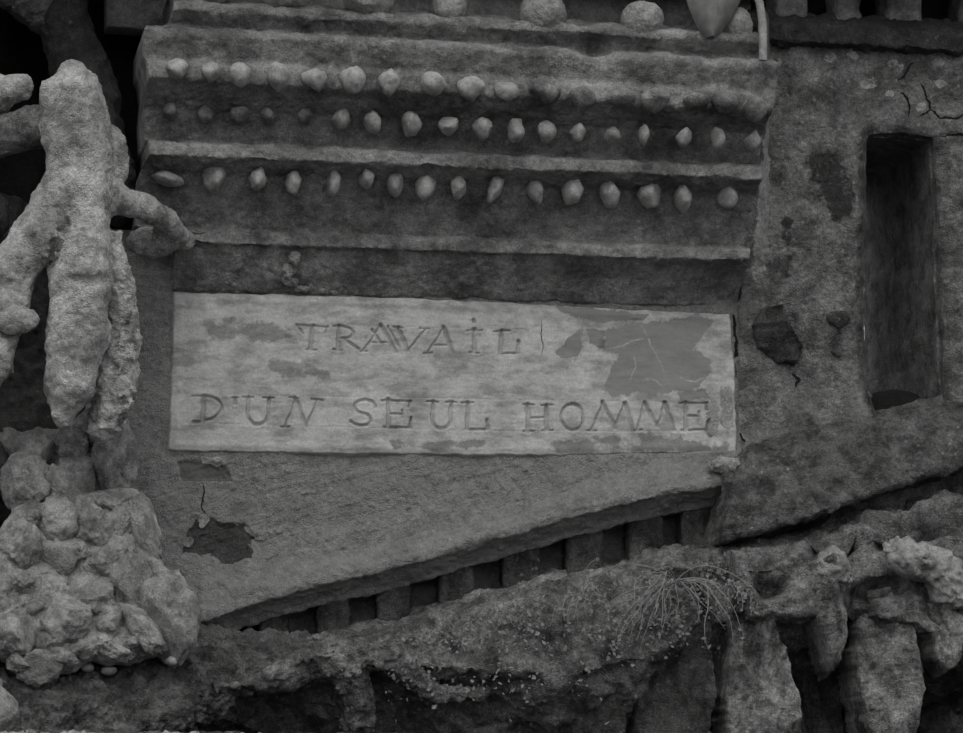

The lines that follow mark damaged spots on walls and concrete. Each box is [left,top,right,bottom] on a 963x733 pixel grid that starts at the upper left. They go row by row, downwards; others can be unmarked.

spalling [182,514,267,564]